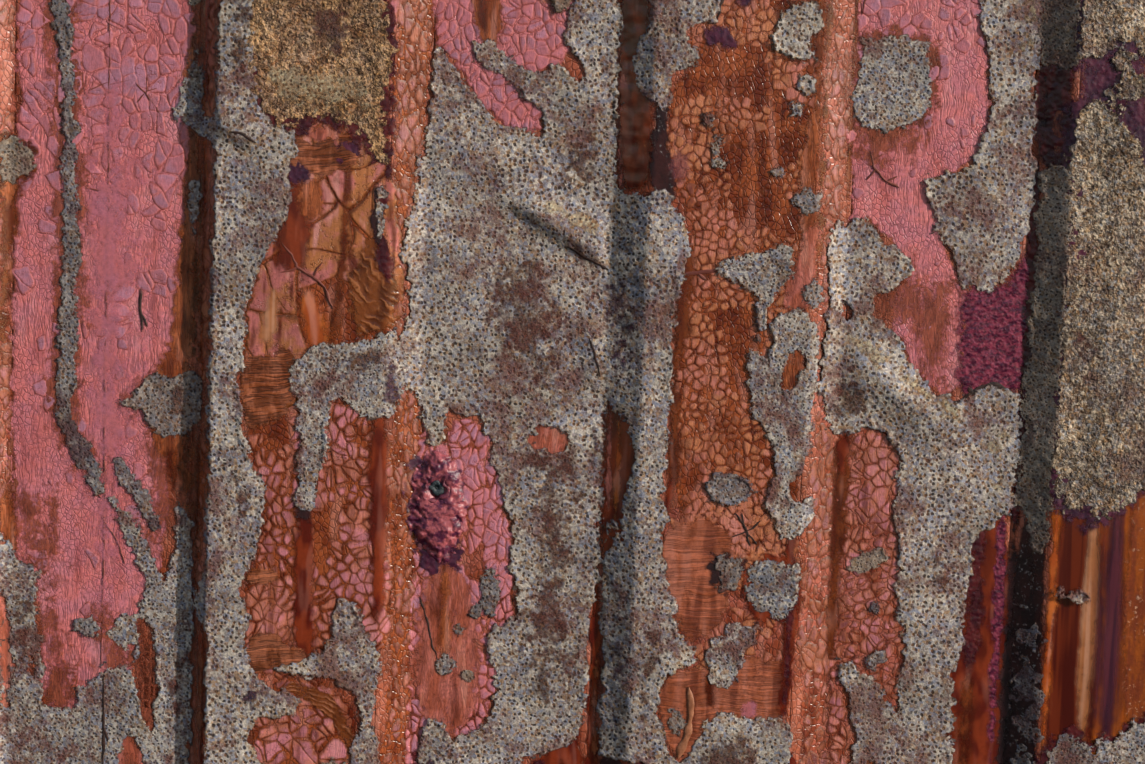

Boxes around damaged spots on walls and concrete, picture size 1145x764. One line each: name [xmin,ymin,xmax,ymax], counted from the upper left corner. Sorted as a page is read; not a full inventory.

crack [0,0,222,764]
peeling [0,0,400,764]
crack [239,0,575,764]
peeling [274,0,803,764]
corrosion [636,631,661,678]
corrosion [641,657,790,764]
crack [659,0,1013,764]
peeling [705,0,1145,764]
corrosion [933,557,948,585]
corrosion [953,0,1145,523]
corrosion [1034,431,1145,764]